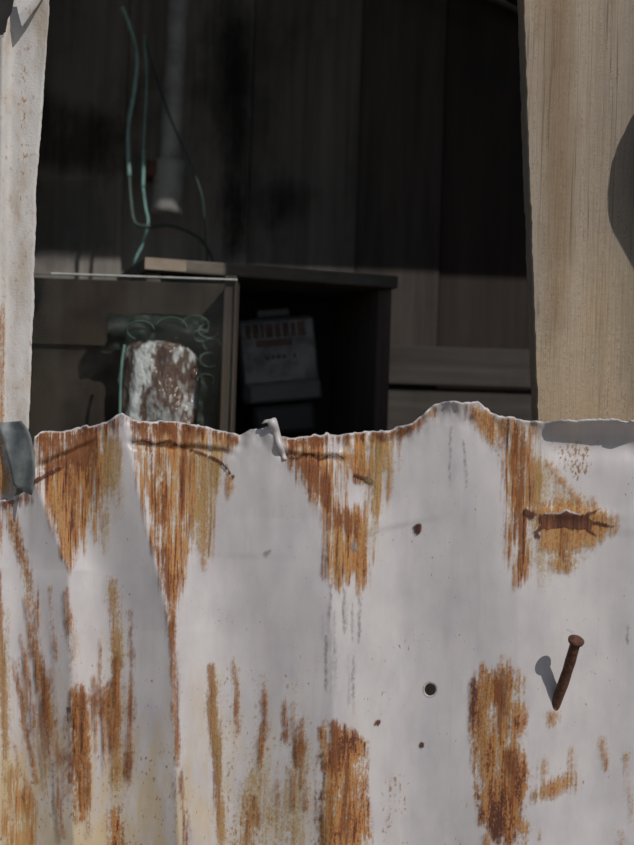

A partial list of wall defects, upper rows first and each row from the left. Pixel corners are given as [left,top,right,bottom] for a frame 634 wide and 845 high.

corrosion [0,437,39,615]
corrosion [34,418,122,570]
corrosion [132,421,239,760]
corrosion [282,407,437,593]
corrosion [466,406,619,586]
peeling [524,508,614,539]
corrosion [0,573,38,845]
corrosion [67,686,90,822]
corrosion [107,806,125,845]
corrosion [107,581,134,791]
corrosion [208,663,371,845]
corrosion [469,661,577,845]